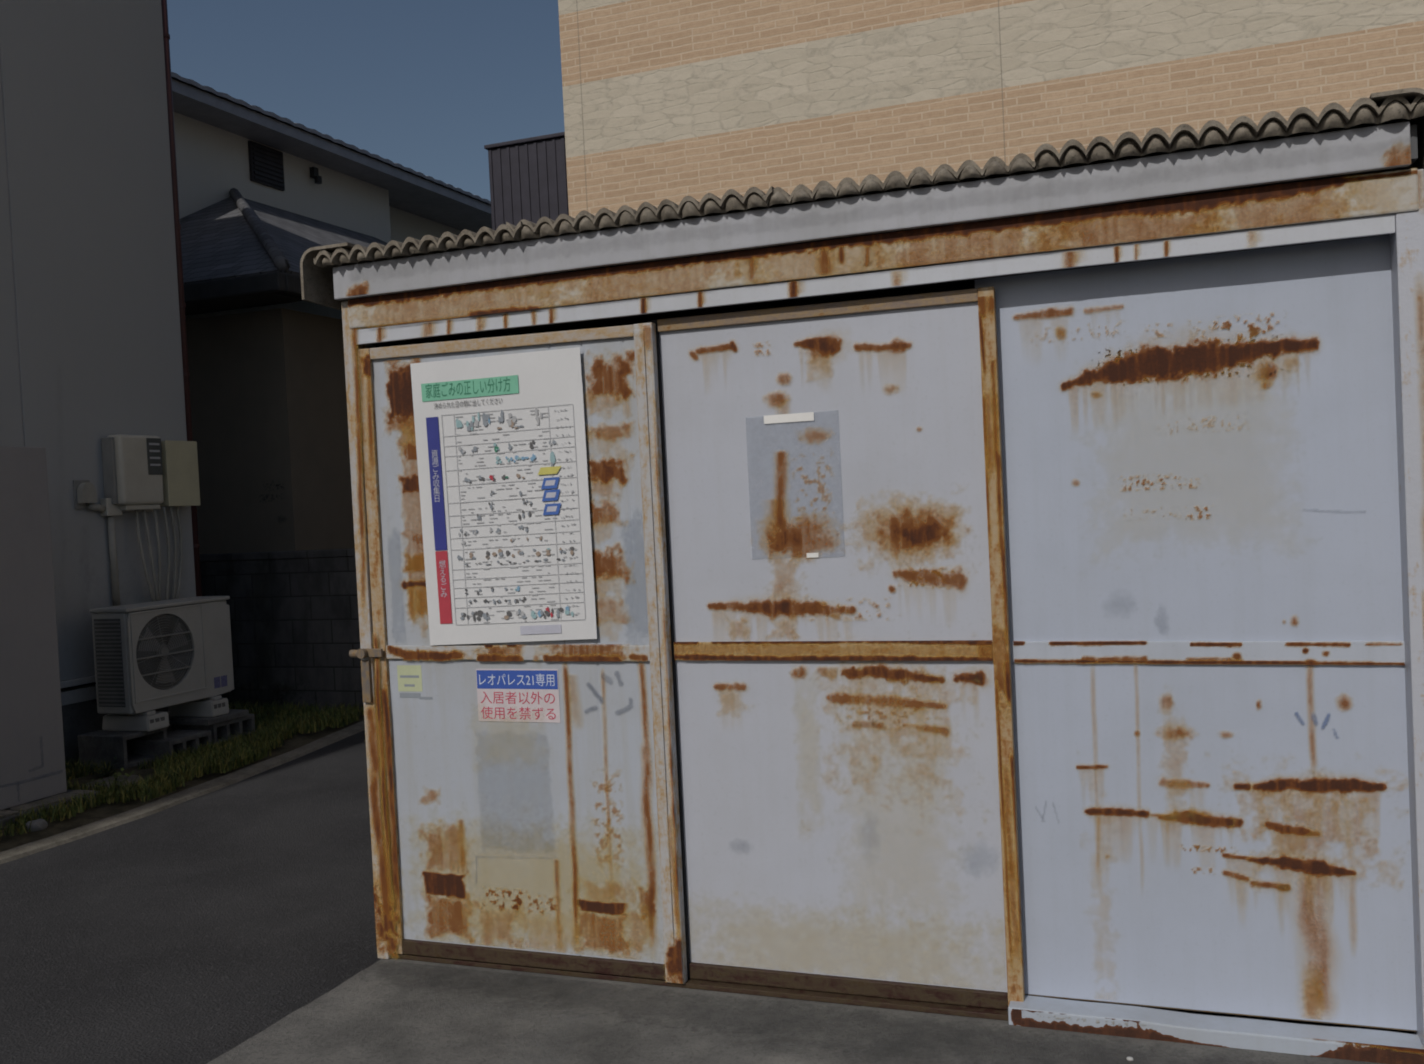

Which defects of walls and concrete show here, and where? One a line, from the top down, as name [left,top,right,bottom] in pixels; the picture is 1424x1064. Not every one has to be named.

rust [347,147,1420,620]
rust [367,296,1405,984]
rust [1190,813,1356,1015]
rust [1313,1038,1424,1054]